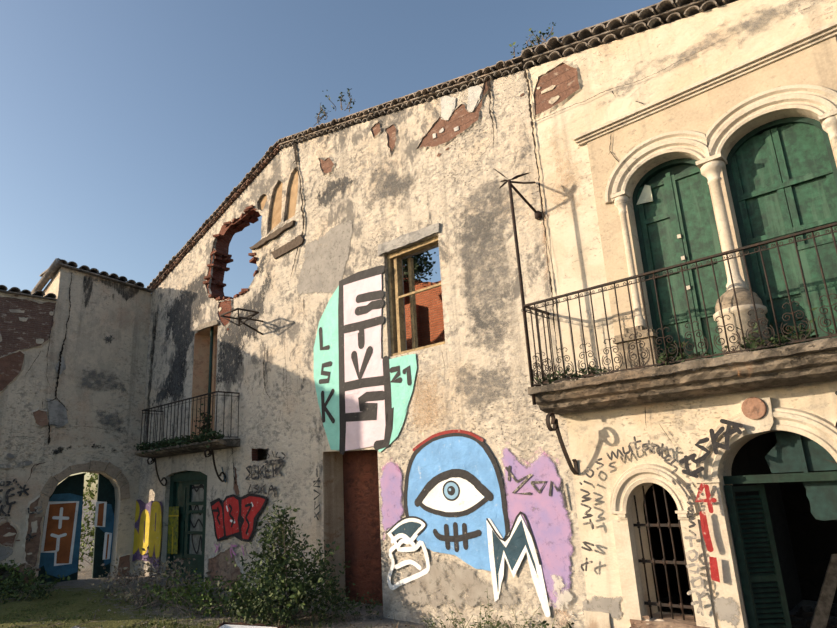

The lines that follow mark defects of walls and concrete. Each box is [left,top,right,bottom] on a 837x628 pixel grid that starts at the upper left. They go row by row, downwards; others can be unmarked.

spalling [370,120,400,157]
spalling [417,77,493,157]
spalling [520,61,583,119]
crack [523,32,739,374]
water stain [457,179,511,351]
spalling [0,295,57,394]
crack [26,273,122,483]
water stain [144,270,209,446]
spalling [0,496,44,574]